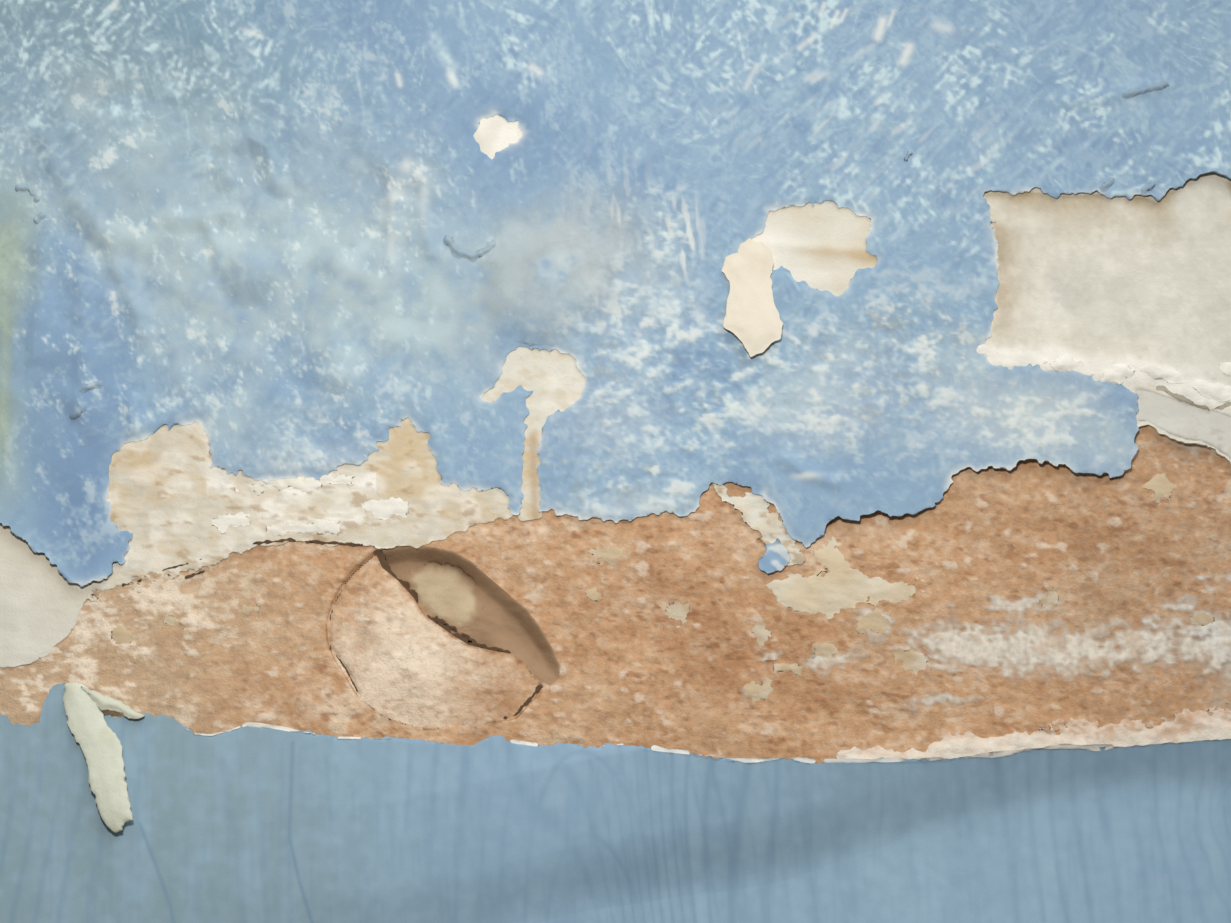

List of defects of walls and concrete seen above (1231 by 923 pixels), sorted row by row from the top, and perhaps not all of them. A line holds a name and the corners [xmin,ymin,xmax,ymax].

peeling [473,115,523,159]
peeling [721,201,877,357]
peeling [976,172,1231,417]
crack [122,559,204,587]
crack [253,538,511,692]
spalling [0,346,1231,763]
crack [503,685,543,720]